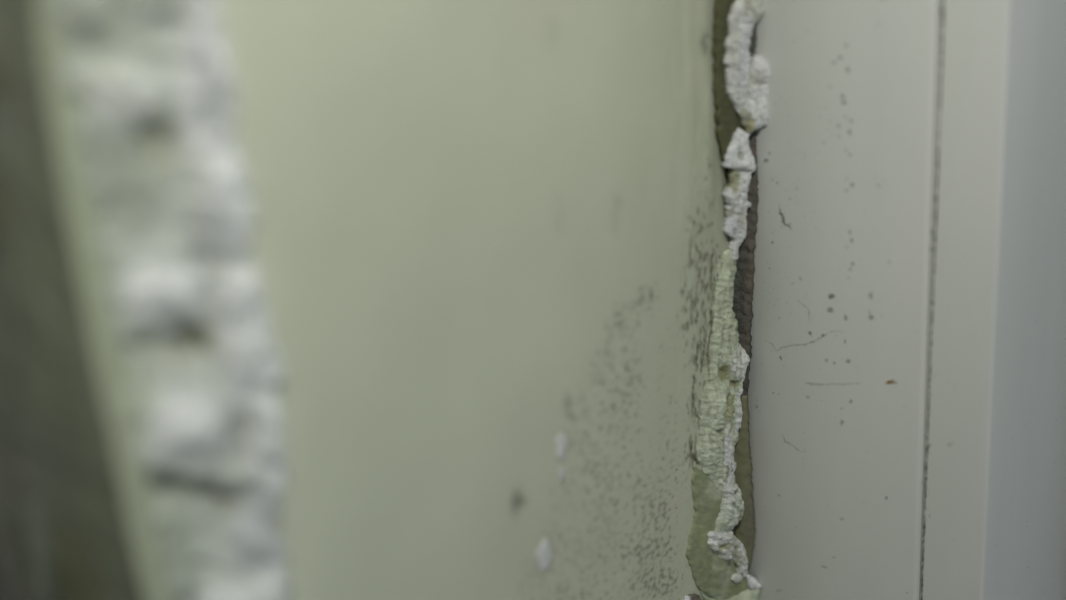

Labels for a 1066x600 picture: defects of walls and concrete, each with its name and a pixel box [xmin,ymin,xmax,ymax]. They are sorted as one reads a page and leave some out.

peeling [712,0,770,261]
peeling [686,466,762,600]